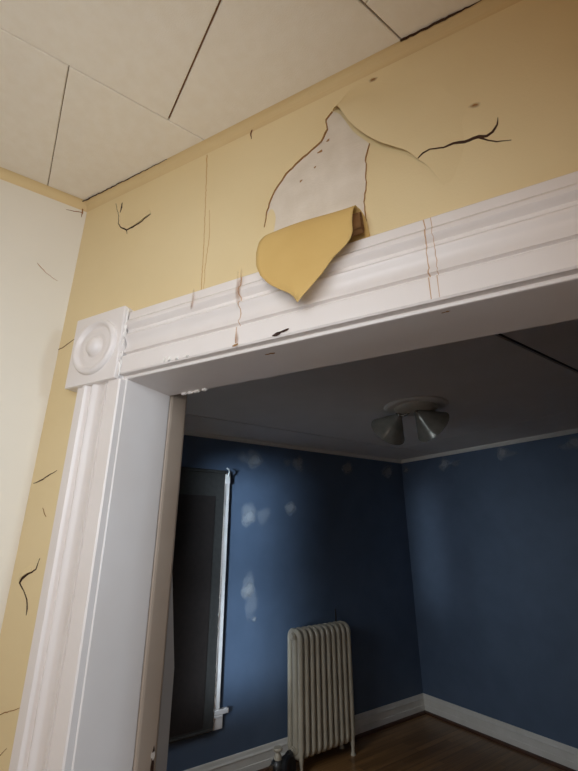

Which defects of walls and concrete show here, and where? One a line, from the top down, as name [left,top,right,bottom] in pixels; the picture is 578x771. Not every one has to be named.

crack [400,0,481,42]
crack [418,118,510,158]
crack [66,159,167,232]
flaking render [267,112,369,232]
crack [234,277,242,343]
crack [16,558,40,615]